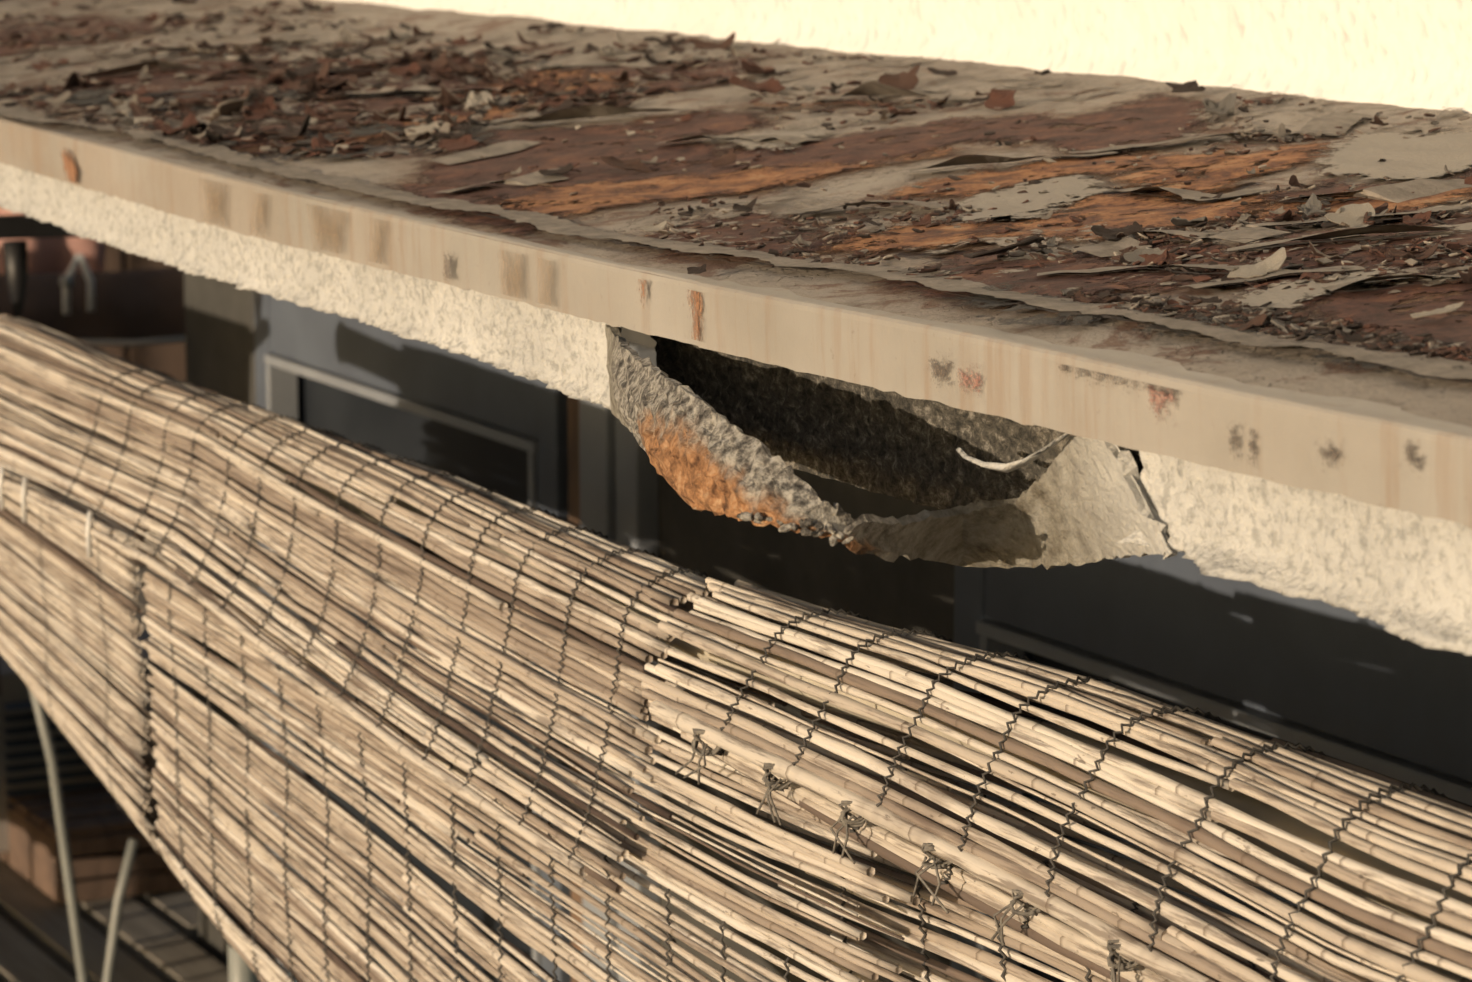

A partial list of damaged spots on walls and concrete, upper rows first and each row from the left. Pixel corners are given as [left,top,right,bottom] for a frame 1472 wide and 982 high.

peeling [0,0,1472,364]
corrosion [1,57,1472,365]
peeling [605,325,1178,570]
peeling [1320,444,1343,468]
peeling [1405,444,1424,470]